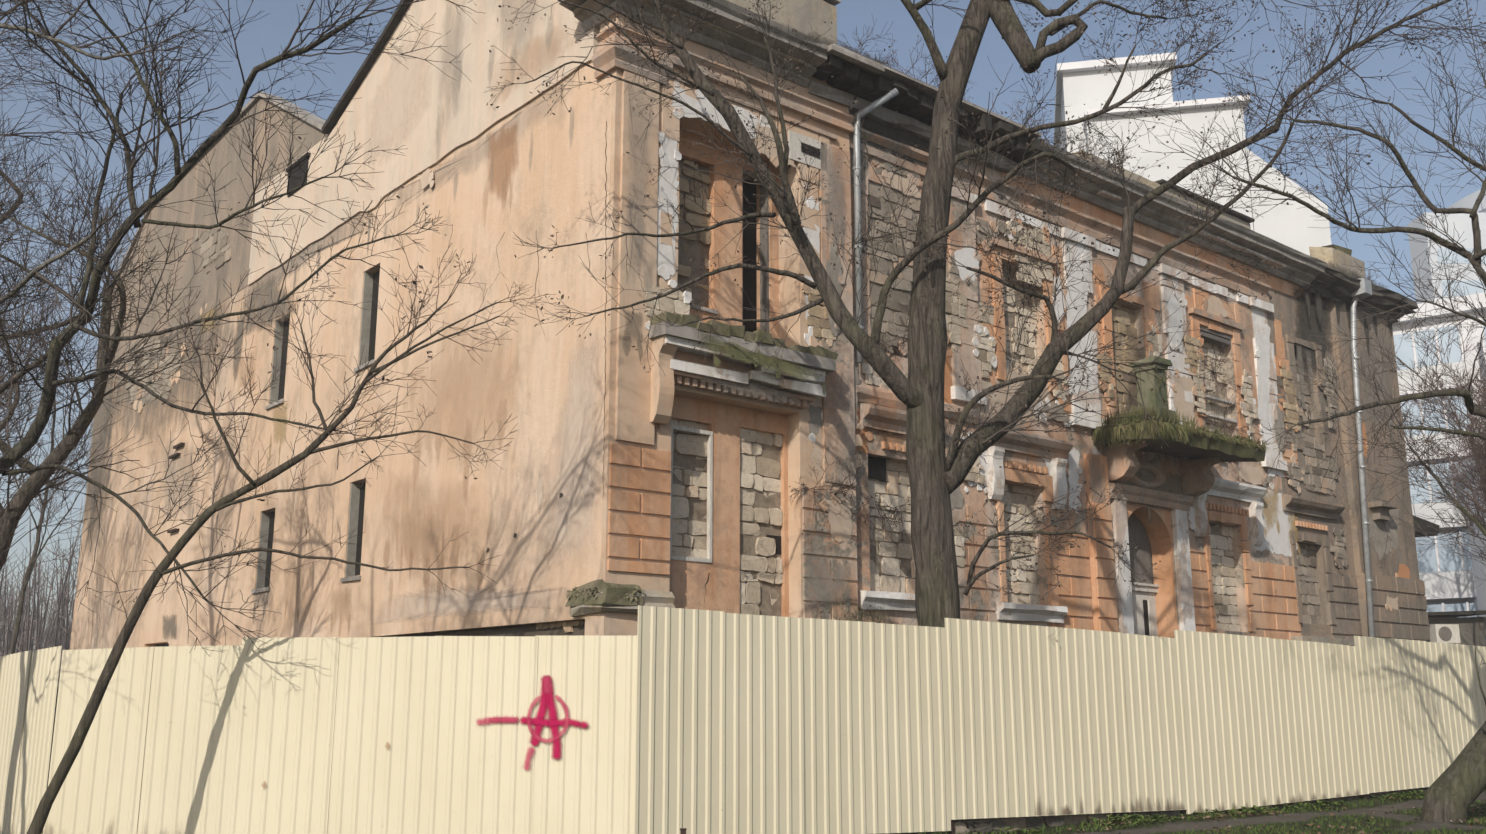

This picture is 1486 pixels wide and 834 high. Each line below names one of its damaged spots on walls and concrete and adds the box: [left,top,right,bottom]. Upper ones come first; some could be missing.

peeling [645,132,703,330]
spalling [670,80,921,379]
peeling [944,218,1116,427]
damp [537,362,594,548]
peeling [808,363,906,543]
spalling [950,450,989,567]
peeling [1041,445,1103,514]
peeling [1369,499,1410,579]
peeling [1385,596,1398,612]